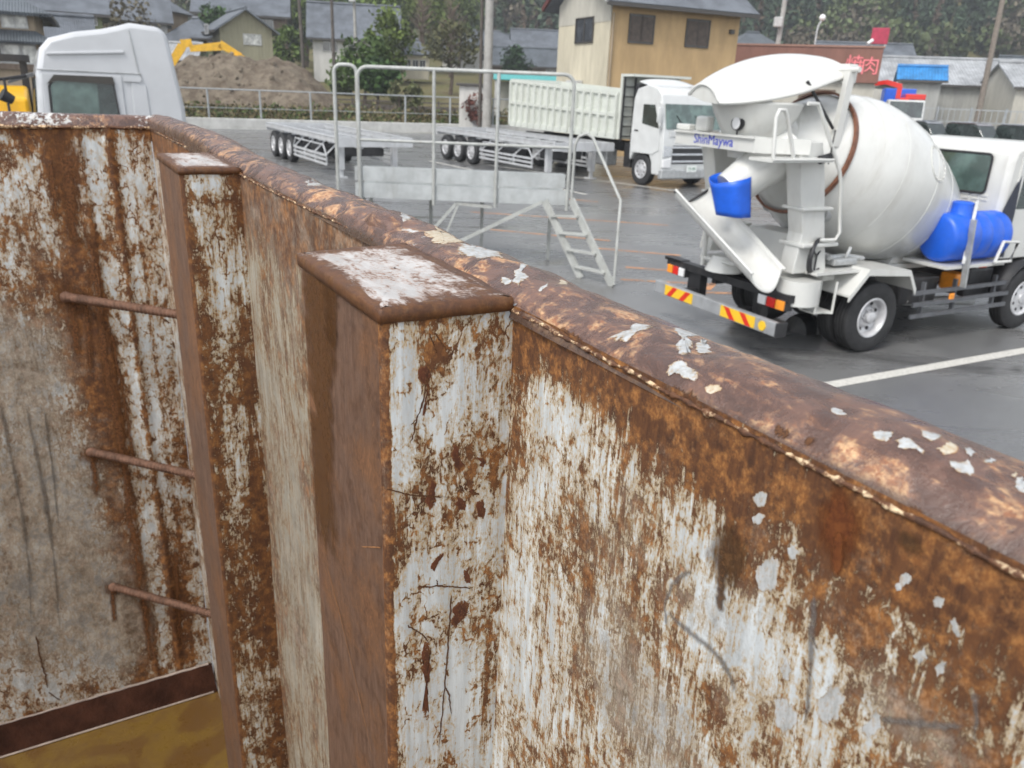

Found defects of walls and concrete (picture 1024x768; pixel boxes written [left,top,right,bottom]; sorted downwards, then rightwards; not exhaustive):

peeling [424,227,504,260]
peeling [501,263,529,286]
peeling [609,323,650,342]
peeling [666,328,722,394]
corrosion [48,138,152,660]
peeling [872,430,996,476]
peeling [1012,472,1024,493]
peeling [752,491,767,525]
peeling [755,545,798,594]
crack [408,580,470,743]